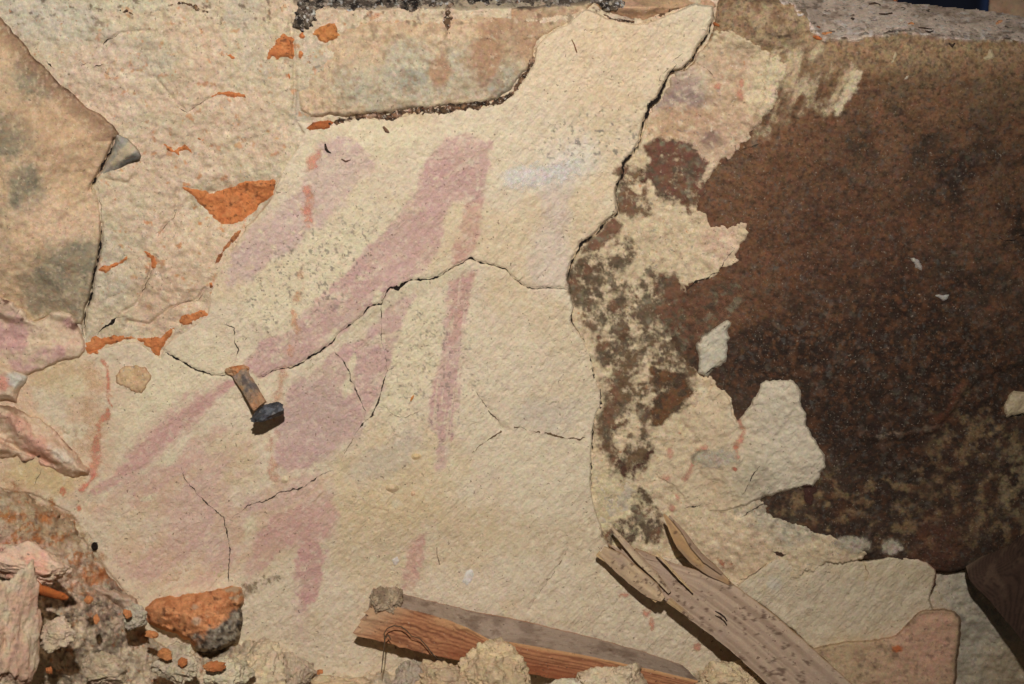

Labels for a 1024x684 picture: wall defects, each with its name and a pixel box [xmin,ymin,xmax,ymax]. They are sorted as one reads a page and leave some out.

crack [685,251,733,292]
crack [181,11,715,580]
crack [166,352,224,376]